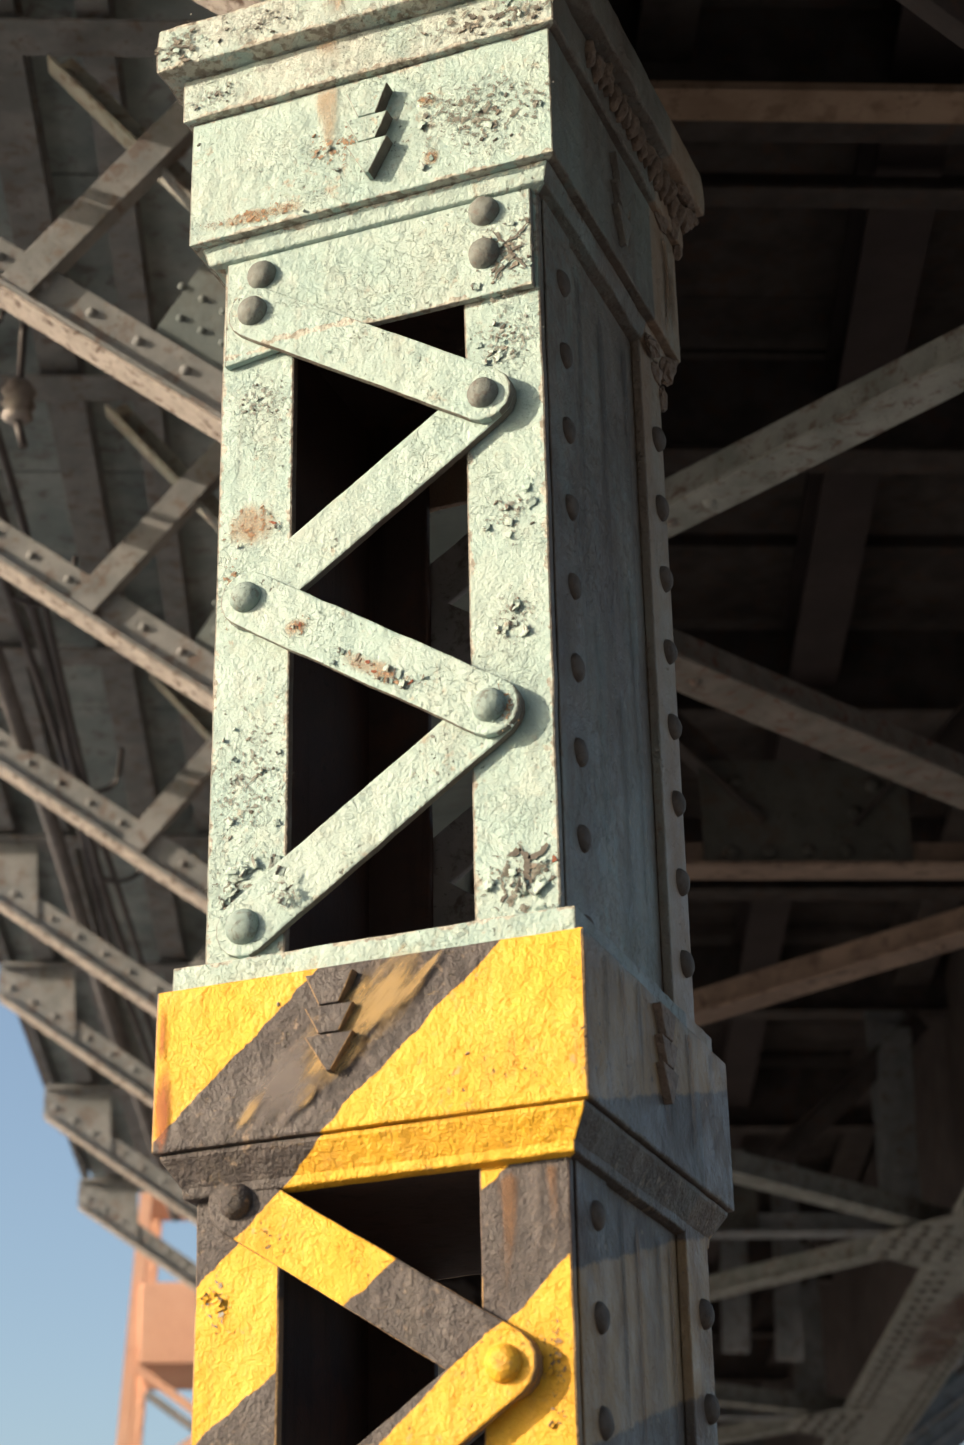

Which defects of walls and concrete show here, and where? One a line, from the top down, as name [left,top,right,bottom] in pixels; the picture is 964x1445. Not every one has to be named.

peeling [152,1,312,70]
peeling [399,0,553,49]
peeling [179,80,246,115]
peeling [391,62,554,166]
peeling [305,125,356,177]
peeling [481,479,544,549]
peeling [492,585,542,651]
peeling [477,825,562,916]
peeling [239,953,439,1126]